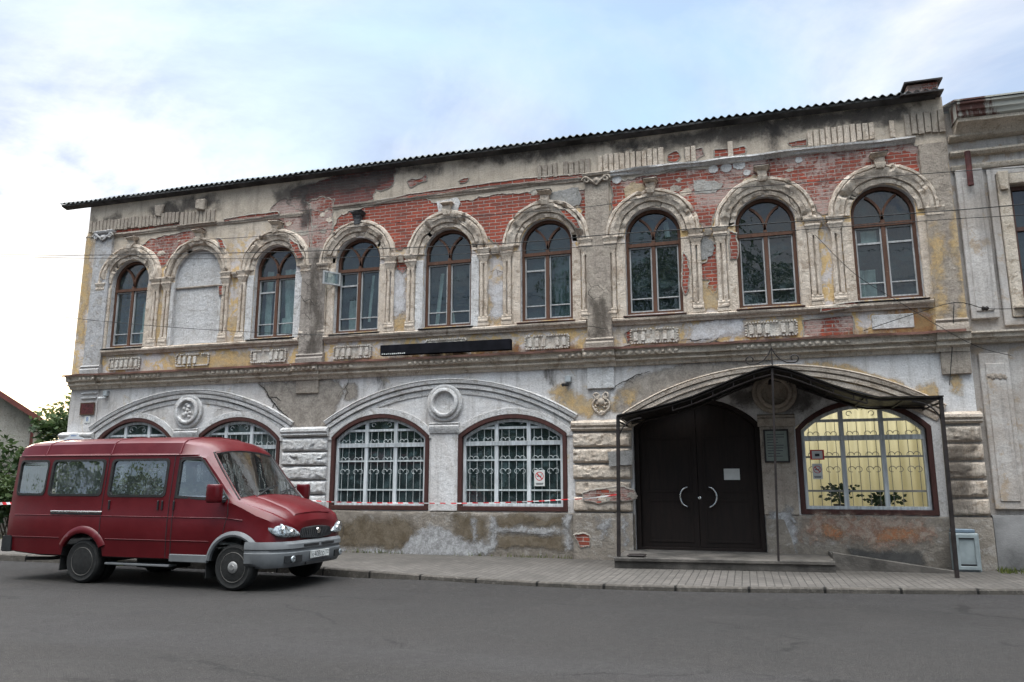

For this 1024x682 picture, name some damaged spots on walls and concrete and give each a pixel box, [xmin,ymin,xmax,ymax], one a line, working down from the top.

flaking render [609,139,921,228]
flaking render [116,220,195,267]
flaking render [223,168,585,331]
leakage [591,297,606,337]
flaking render [802,301,860,337]
crack [216,384,288,417]
flaking render [573,532,591,548]